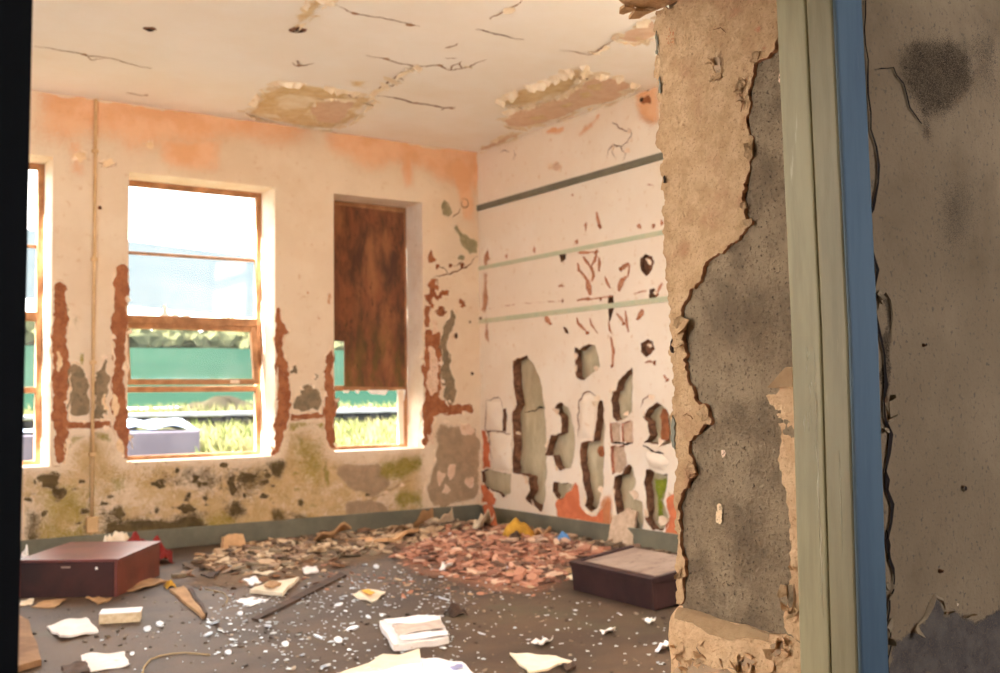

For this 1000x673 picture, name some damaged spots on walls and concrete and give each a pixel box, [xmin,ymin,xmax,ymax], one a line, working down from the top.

crack [34,46,147,68]
peeling [236,81,376,132]
crack [337,5,420,27]
crack [363,1,524,110]
crack [607,123,632,157]
crack [864,0,922,213]
leakage [894,24,1000,140]
spalling [418,51,799,673]
leakage [21,420,426,540]
crack [874,254,895,668]